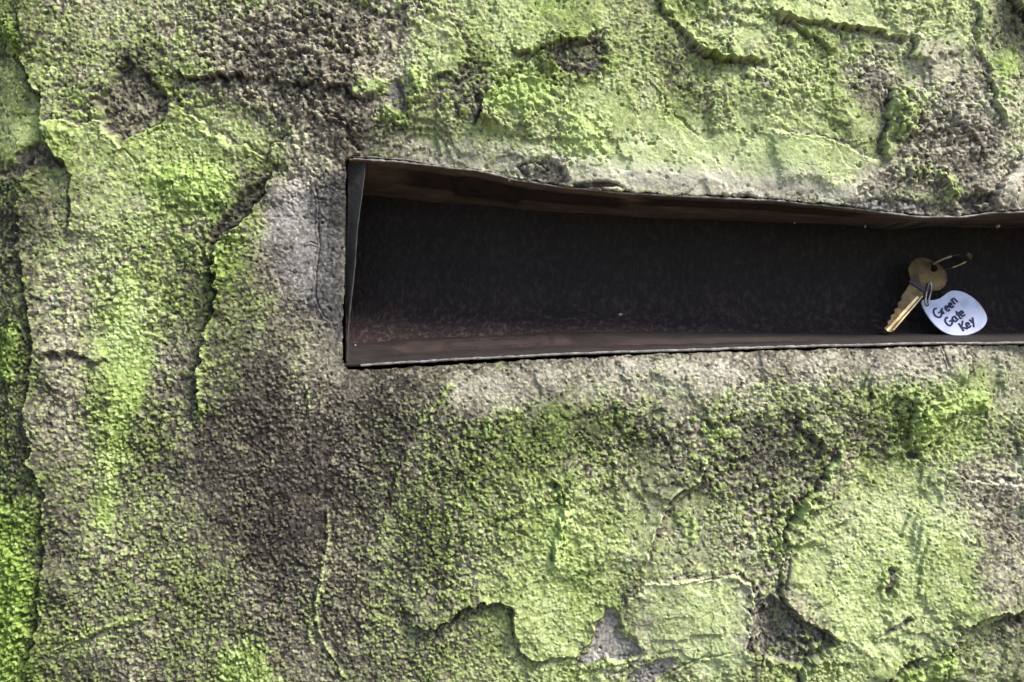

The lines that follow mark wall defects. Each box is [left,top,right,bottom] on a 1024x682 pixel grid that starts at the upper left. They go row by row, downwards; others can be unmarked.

crack [304,178,338,328]
flaking render [400,448,1024,682]